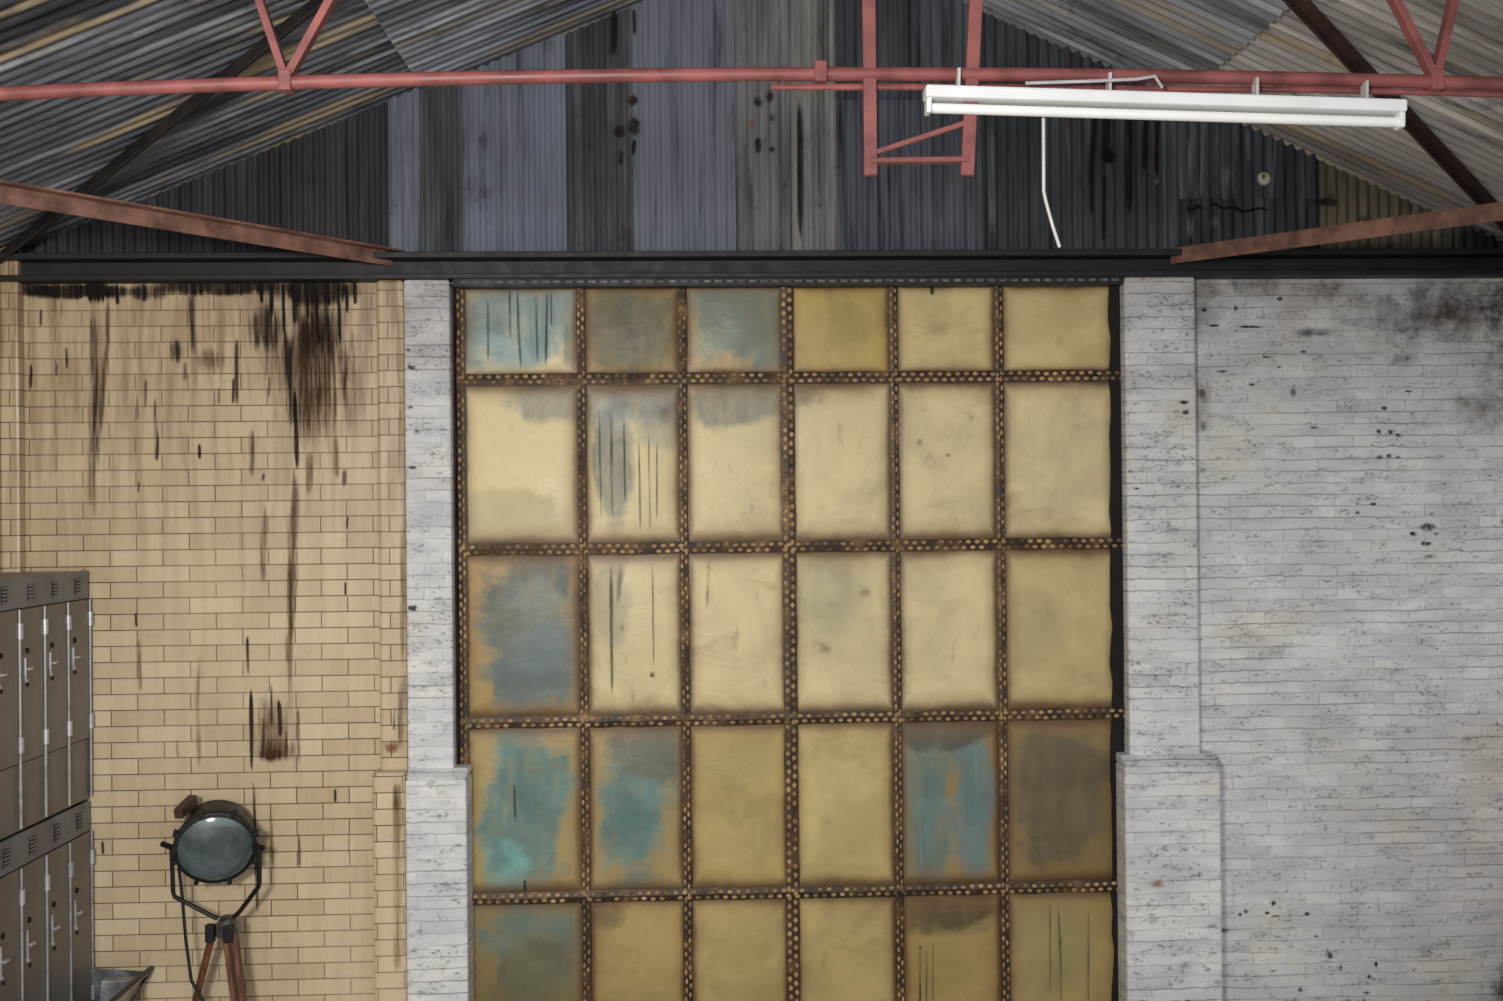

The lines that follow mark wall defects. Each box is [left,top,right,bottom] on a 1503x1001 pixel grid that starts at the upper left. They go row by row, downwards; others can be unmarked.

leakage [90,310,109,451]
leakage [172,299,347,667]
leakage [249,687,299,768]